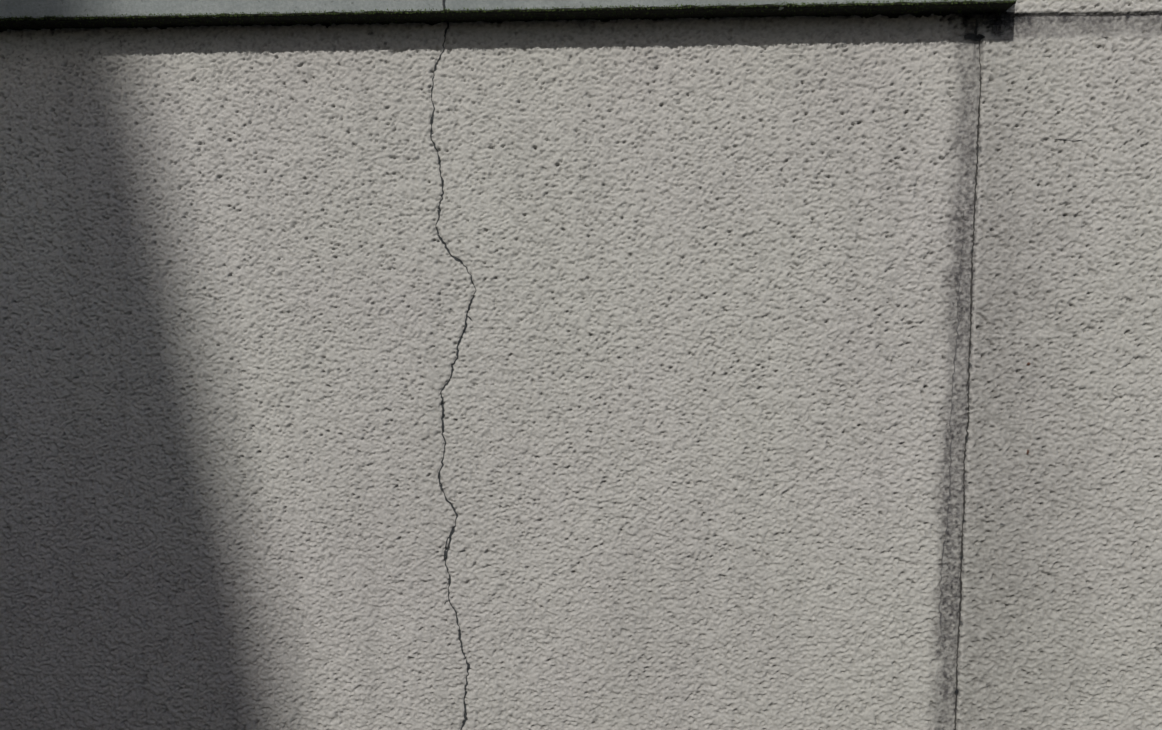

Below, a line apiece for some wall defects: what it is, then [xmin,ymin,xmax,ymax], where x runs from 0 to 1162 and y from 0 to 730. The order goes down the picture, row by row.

crack [430,0,476,730]